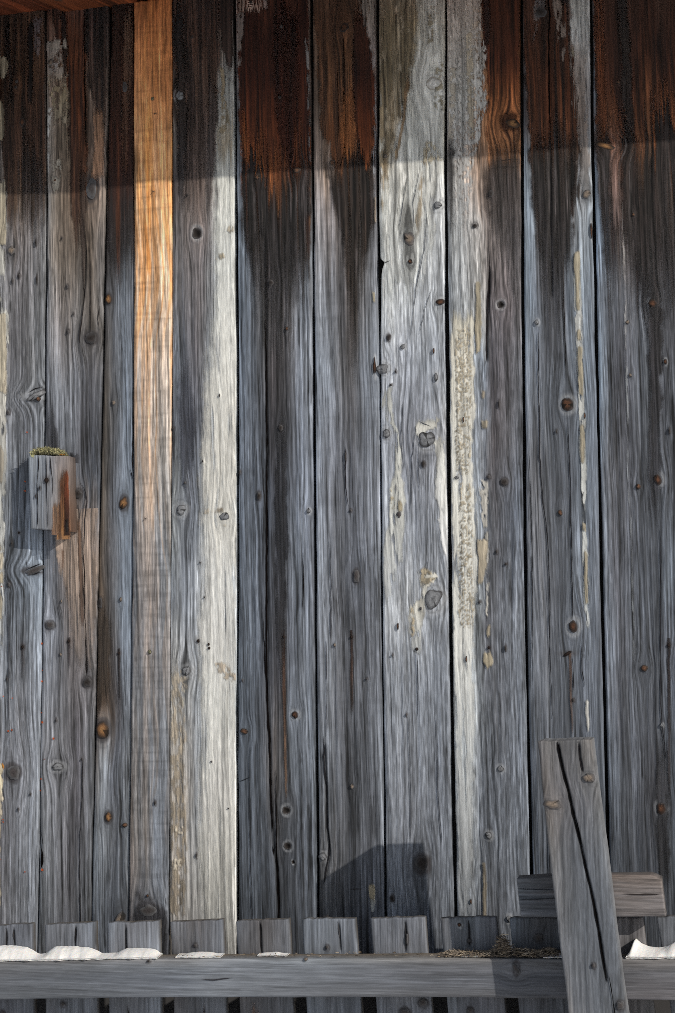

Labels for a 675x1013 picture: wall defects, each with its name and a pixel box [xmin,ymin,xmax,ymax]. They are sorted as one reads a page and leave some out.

peeling [0,56,8,79]
water stain [173,0,417,332]
water stain [481,0,582,286]
water stain [593,0,675,515]
peeling [0,297,9,646]
peeling [408,568,438,655]
peeling [416,282,493,915]
crack [557,741,615,1013]